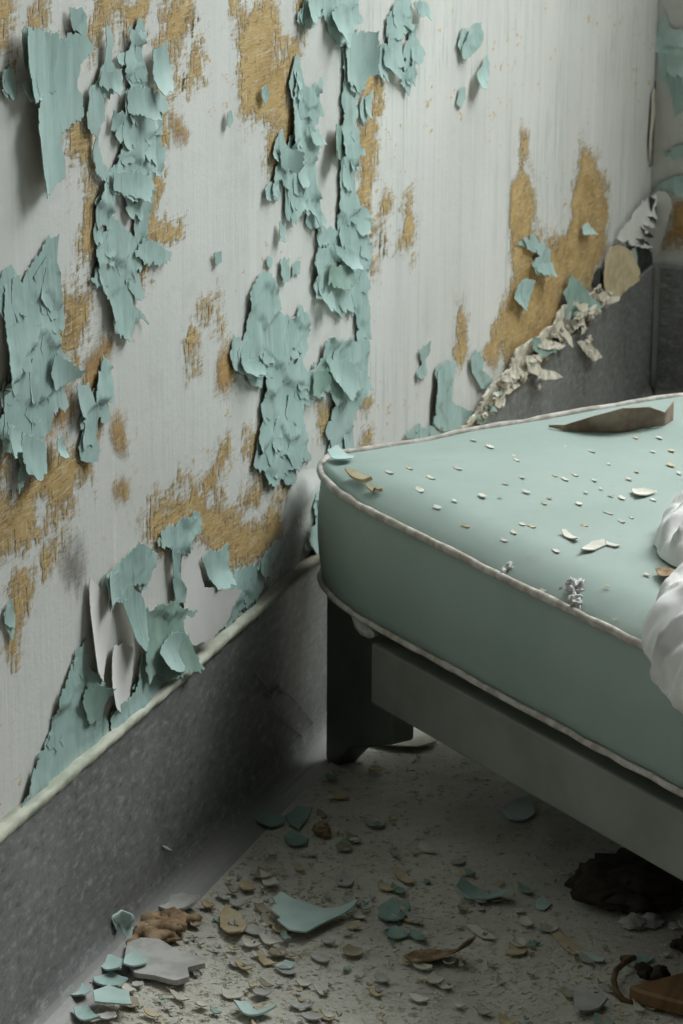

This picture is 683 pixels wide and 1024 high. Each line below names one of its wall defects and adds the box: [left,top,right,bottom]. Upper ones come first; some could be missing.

peeling [458,23,490,89]
peeling [0,0,433,808]
peeling [405,126,683,439]